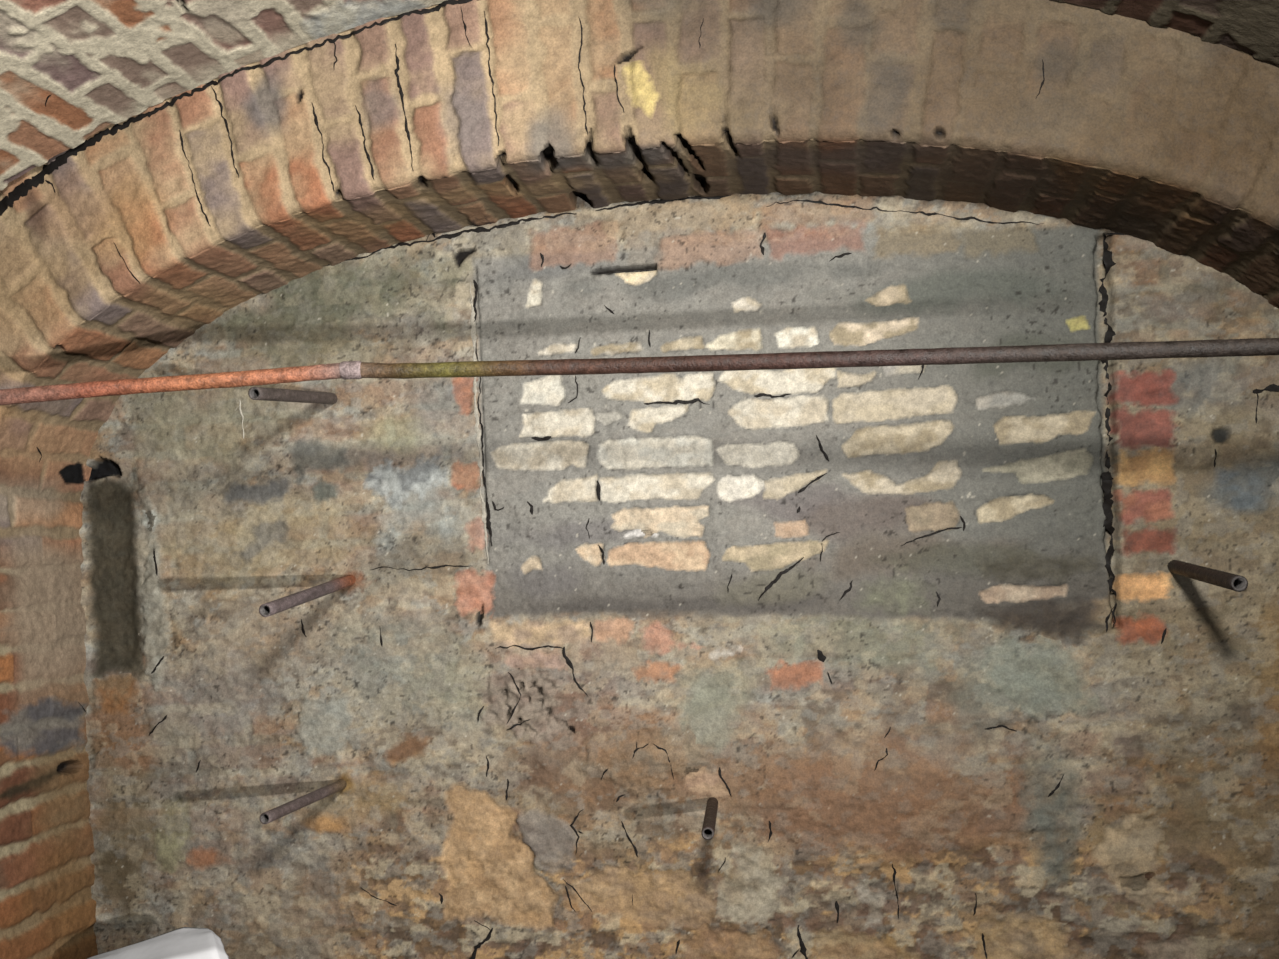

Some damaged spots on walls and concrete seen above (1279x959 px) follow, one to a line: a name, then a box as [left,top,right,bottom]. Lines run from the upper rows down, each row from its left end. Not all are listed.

crack [0,0,499,226]
crack [578,18,588,134]
flaking render [452,247,478,317]
spalling [588,263,659,287]
flaking render [660,283,921,353]
spalling [58,457,122,486]
crack [473,280,533,546]
flaking render [449,365,1181,647]
crack [1099,232,1126,632]
crack [758,532,840,601]
crack [477,622,593,730]
flaking render [438,781,789,959]